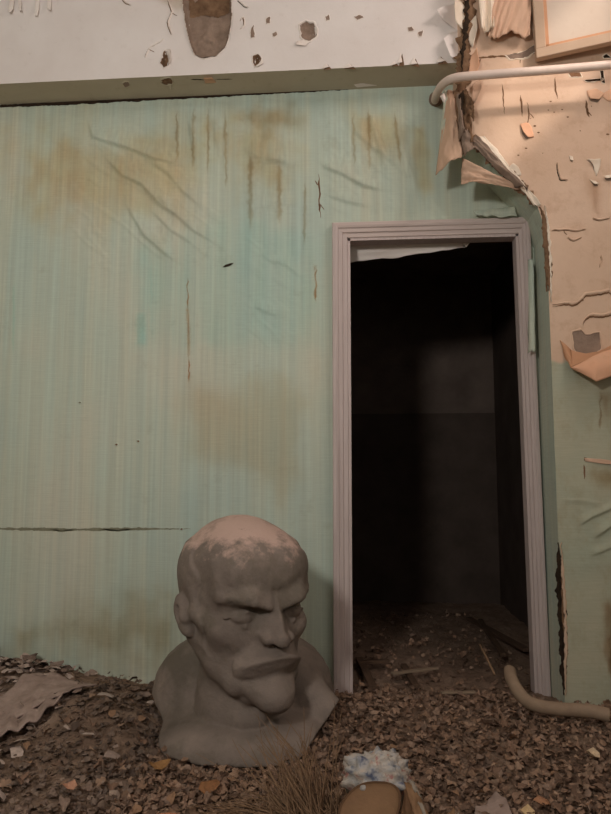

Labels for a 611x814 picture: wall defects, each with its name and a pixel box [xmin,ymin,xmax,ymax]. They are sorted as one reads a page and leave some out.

flaking render [182,0,233,60]
flaking render [295,14,331,46]
flaking render [436,0,482,103]
flaking render [505,45,535,60]
peeling [568,70,605,107]
peeling [510,118,540,176]
peeling [587,159,611,186]
peeling [528,259,536,353]
peeling [553,288,611,307]
flaking render [571,311,611,353]
crack [0,525,189,533]